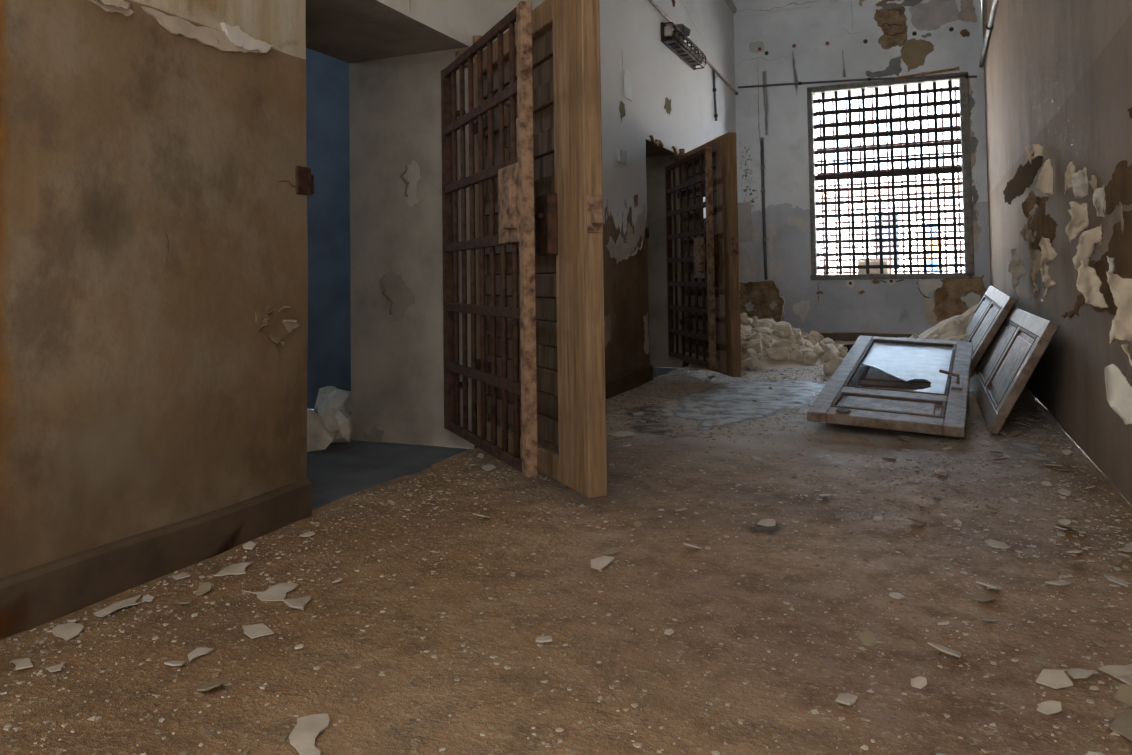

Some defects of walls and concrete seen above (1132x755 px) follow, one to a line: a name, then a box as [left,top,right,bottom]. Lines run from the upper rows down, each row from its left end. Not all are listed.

peeling [858,0,977,78]
spalling [968,75,982,252]
peeling [607,194,646,264]
spalling [917,275,987,326]
peeling [1003,144,1132,425]